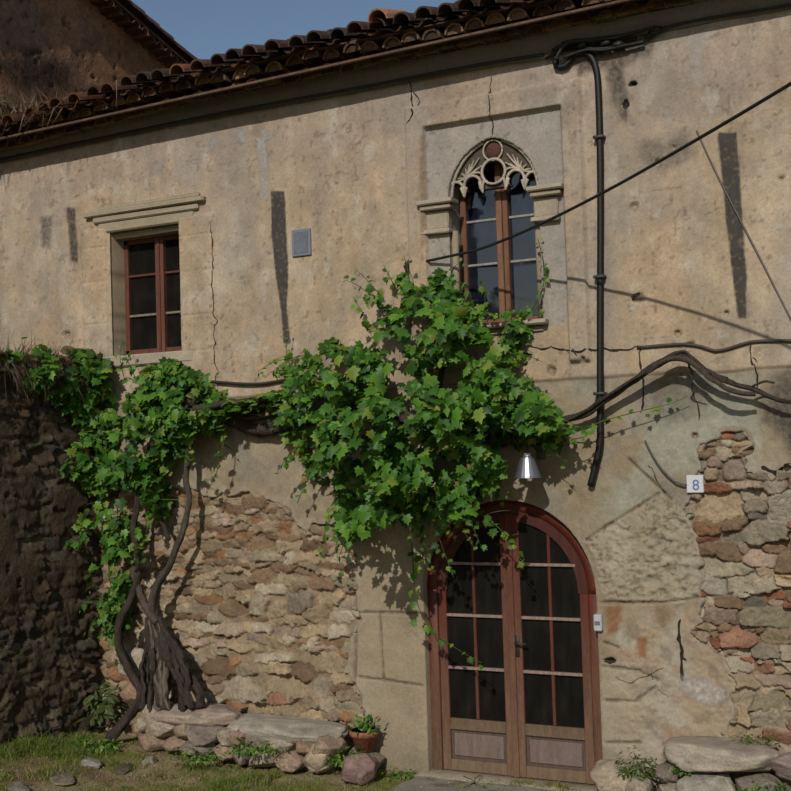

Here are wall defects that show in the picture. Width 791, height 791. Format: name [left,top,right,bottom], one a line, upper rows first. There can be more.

crack [406,81,420,124]
crack [487,77,495,135]
flaking render [98,482,366,749]
flaking render [685,426,791,748]
crack [616,619,687,696]